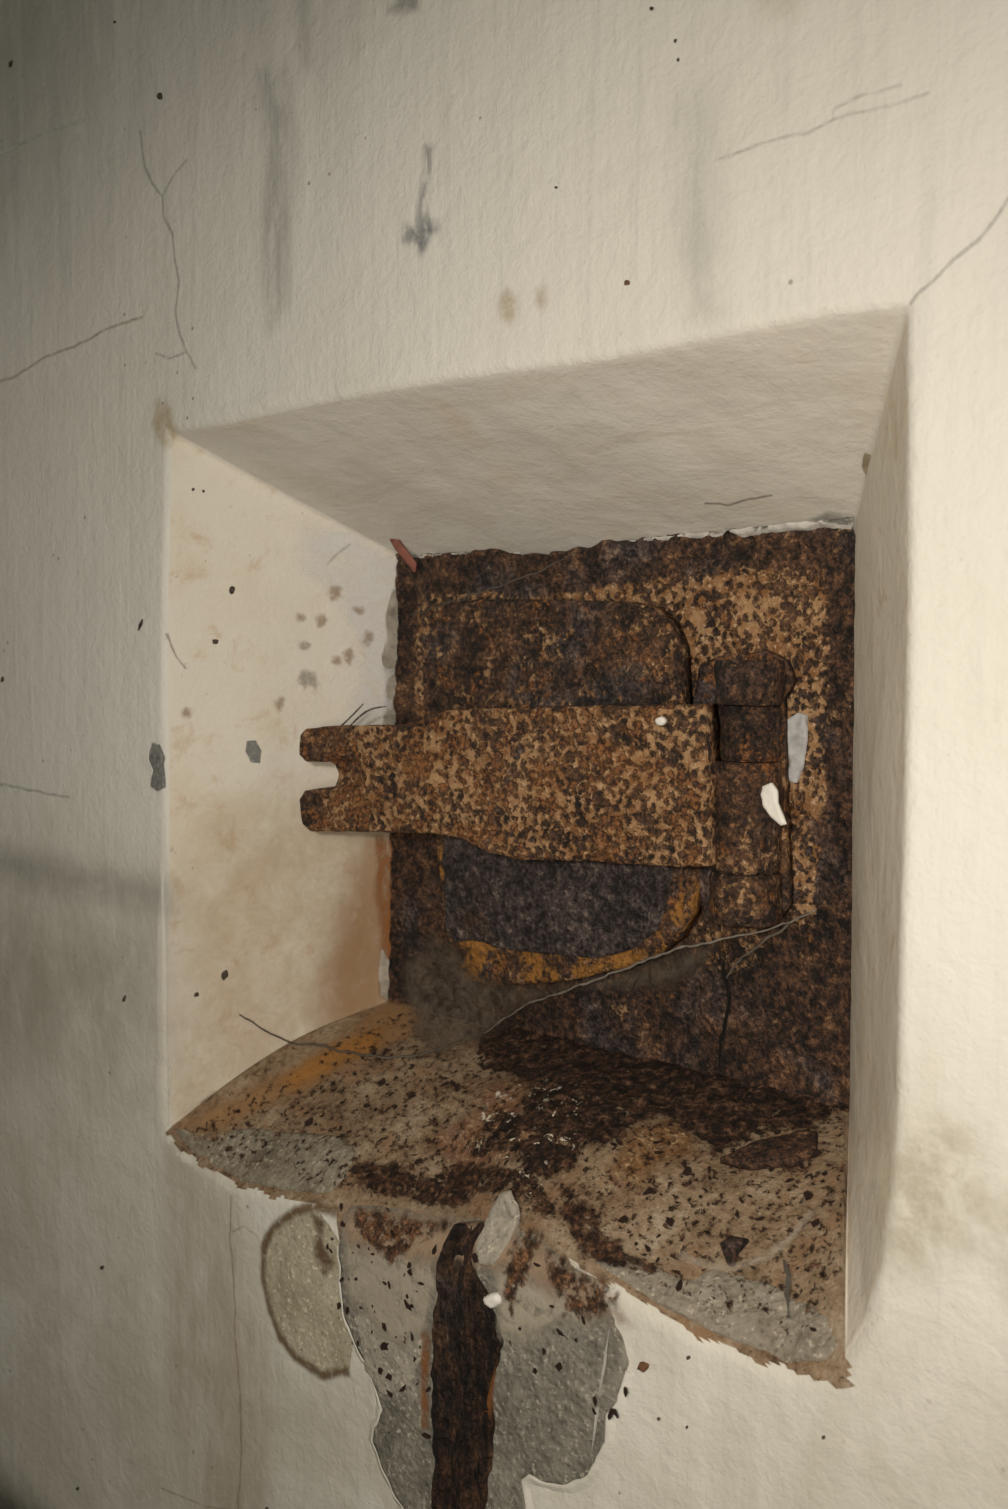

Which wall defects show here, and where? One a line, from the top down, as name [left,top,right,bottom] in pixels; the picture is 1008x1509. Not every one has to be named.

flaking render [174,1128,838,1509]
rust [351,1025,849,1275]